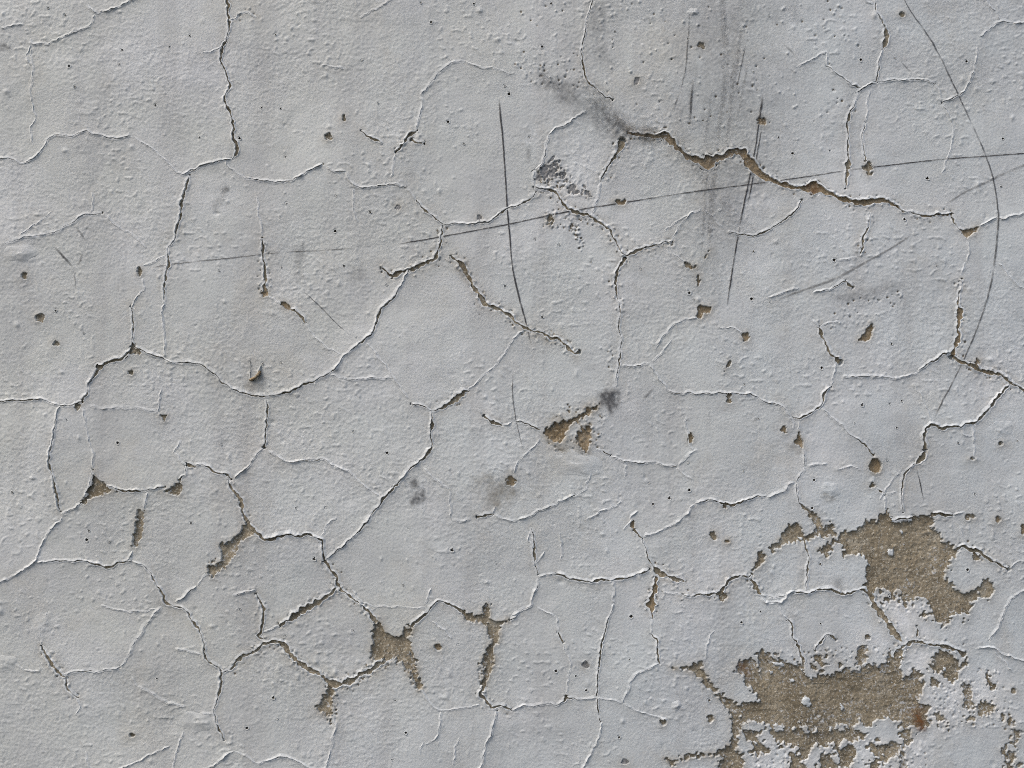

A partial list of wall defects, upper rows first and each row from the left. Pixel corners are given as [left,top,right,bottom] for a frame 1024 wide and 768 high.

crack [531,0,1024,390]
spalling [80,474,118,504]
spalling [207,515,264,578]
crack [0,0,580,768]
spalling [543,403,600,453]
crack [476,262,1024,768]
peeling [746,504,994,628]
spalling [370,620,423,689]
spalling [462,604,510,686]
peeling [665,634,1023,768]